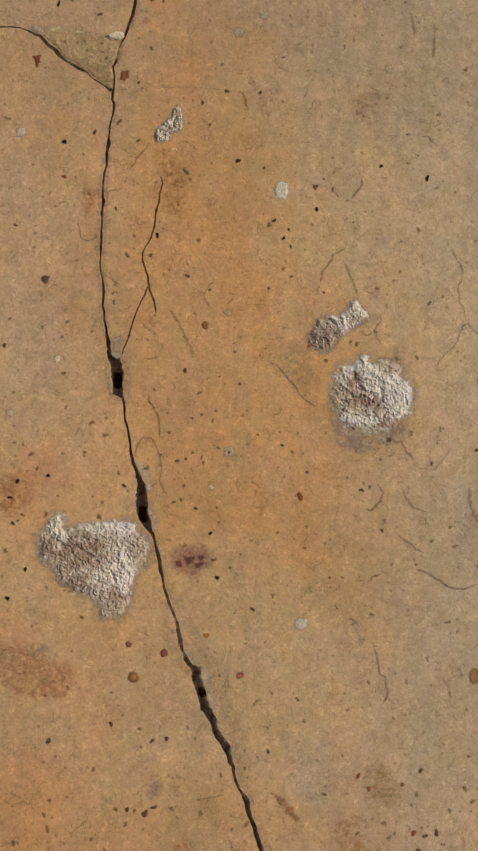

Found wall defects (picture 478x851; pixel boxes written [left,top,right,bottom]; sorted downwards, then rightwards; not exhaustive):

crack [0,0,266,851]